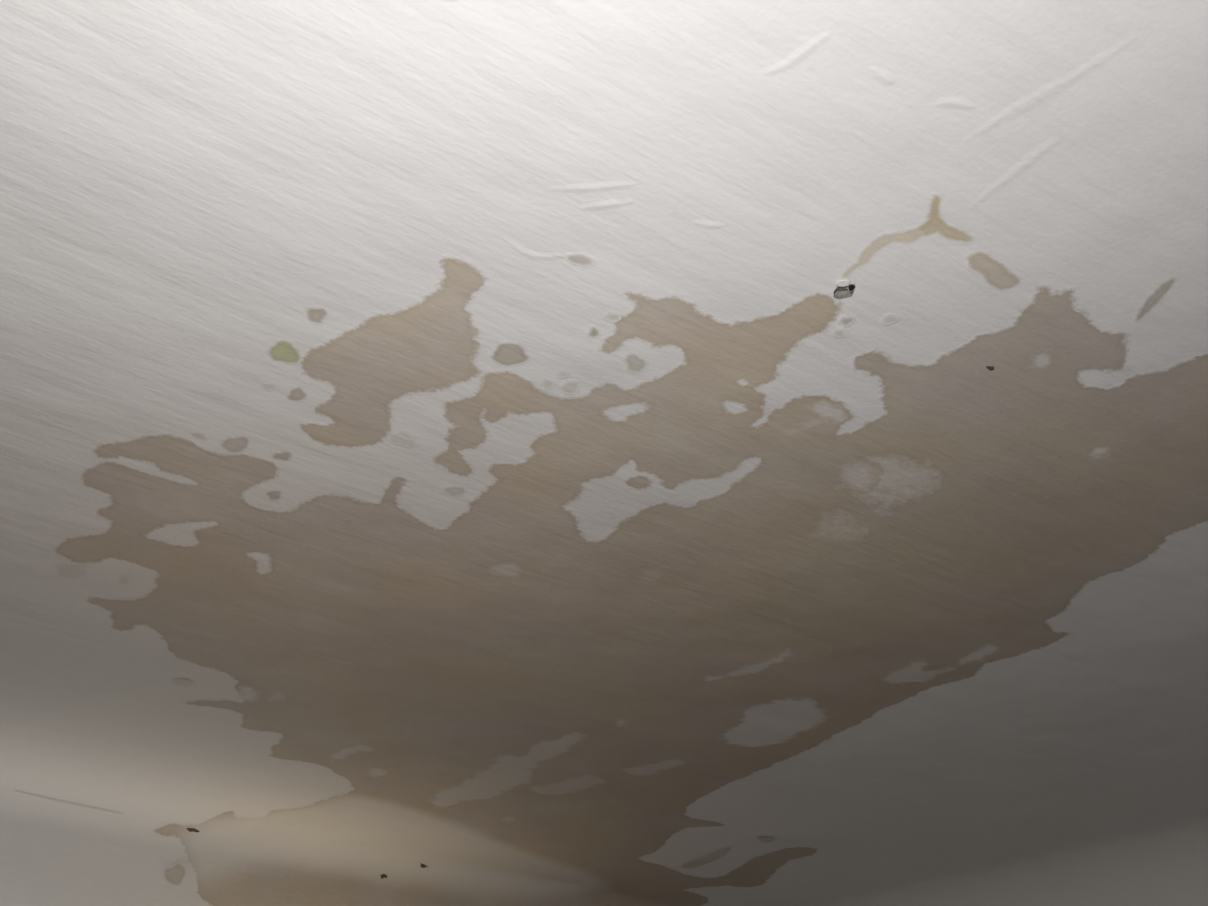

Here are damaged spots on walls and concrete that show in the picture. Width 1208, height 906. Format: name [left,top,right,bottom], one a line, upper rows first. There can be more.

water stain [52,253,1208,906]